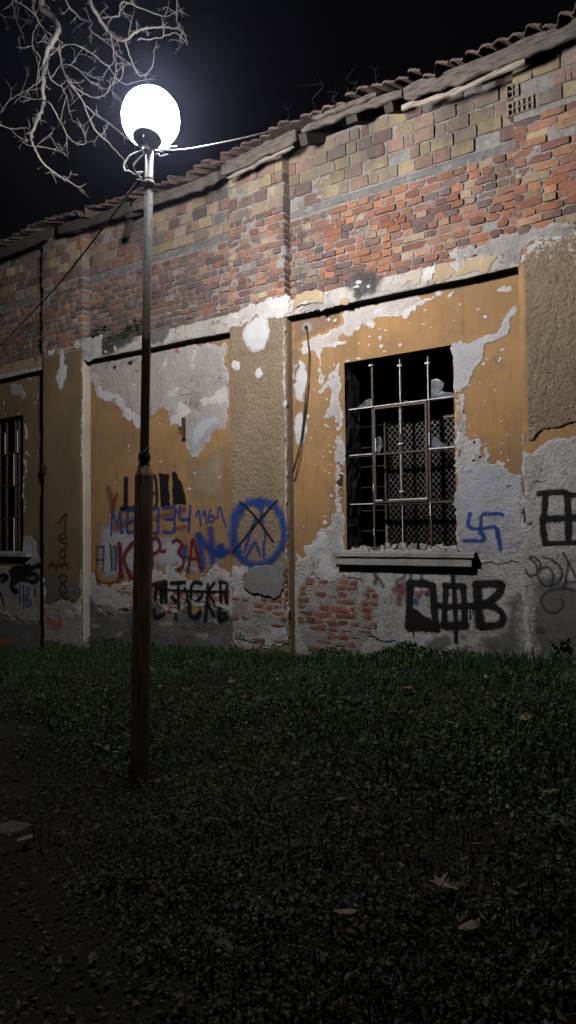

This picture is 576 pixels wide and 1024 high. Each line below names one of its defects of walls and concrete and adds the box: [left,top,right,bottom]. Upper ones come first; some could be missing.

peeling [73,334,229,458]
peeling [151,222,576,667]
peeling [0,536,133,655]